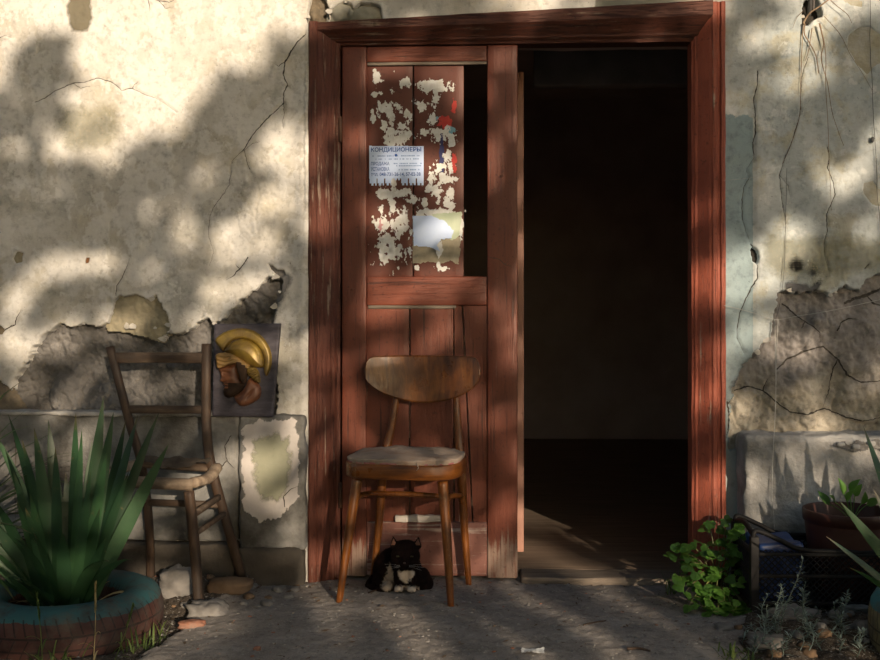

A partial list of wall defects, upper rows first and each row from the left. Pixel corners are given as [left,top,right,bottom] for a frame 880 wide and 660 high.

crack [36,78,175,111]
crack [208,34,306,263]
flaking render [304,0,382,24]
crack [737,71,758,348]
crack [824,147,836,270]
flaking render [0,264,285,411]
crack [726,237,880,436]
flaking render [728,274,880,452]